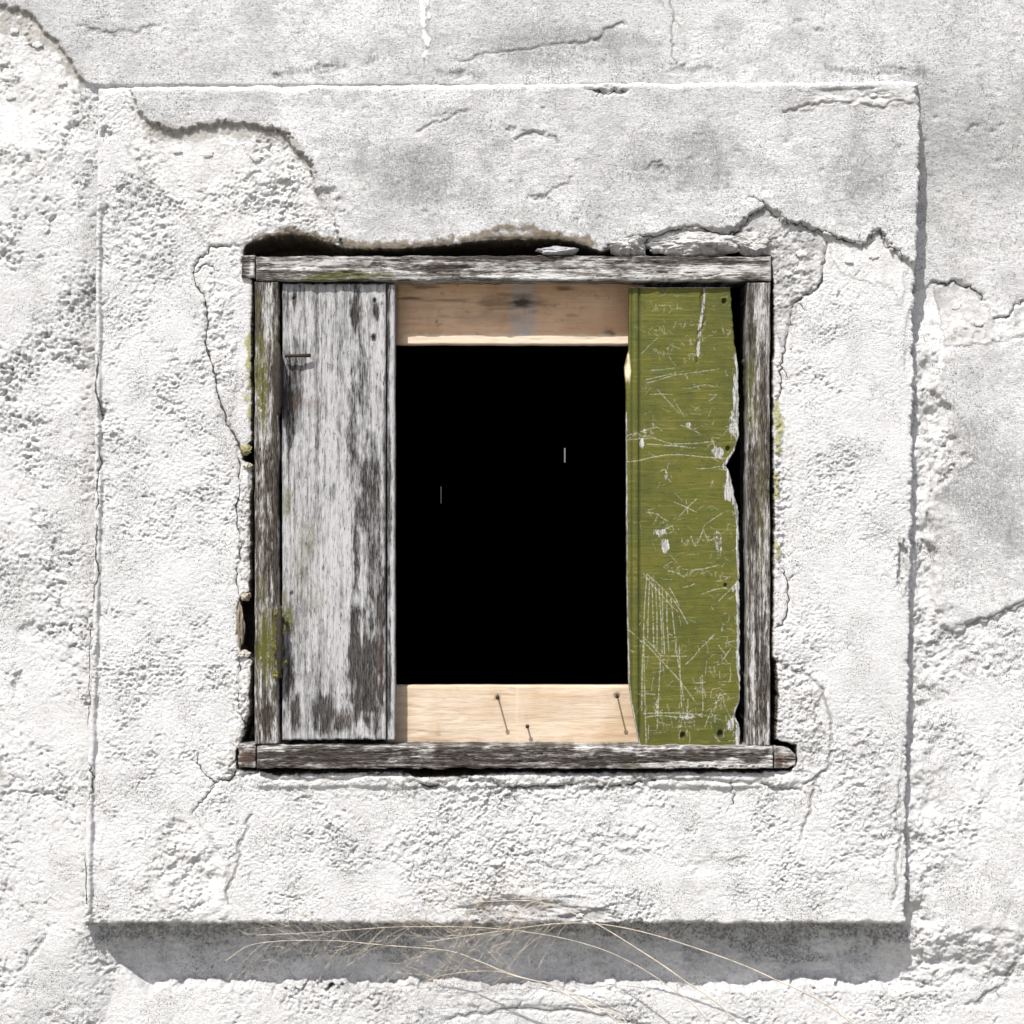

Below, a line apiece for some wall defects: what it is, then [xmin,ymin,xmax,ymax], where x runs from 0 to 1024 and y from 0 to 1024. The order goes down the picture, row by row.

crack [605,196,903,396]
crack [933,280,1022,319]
crack [193,246,255,594]
crack [930,602,1024,646]